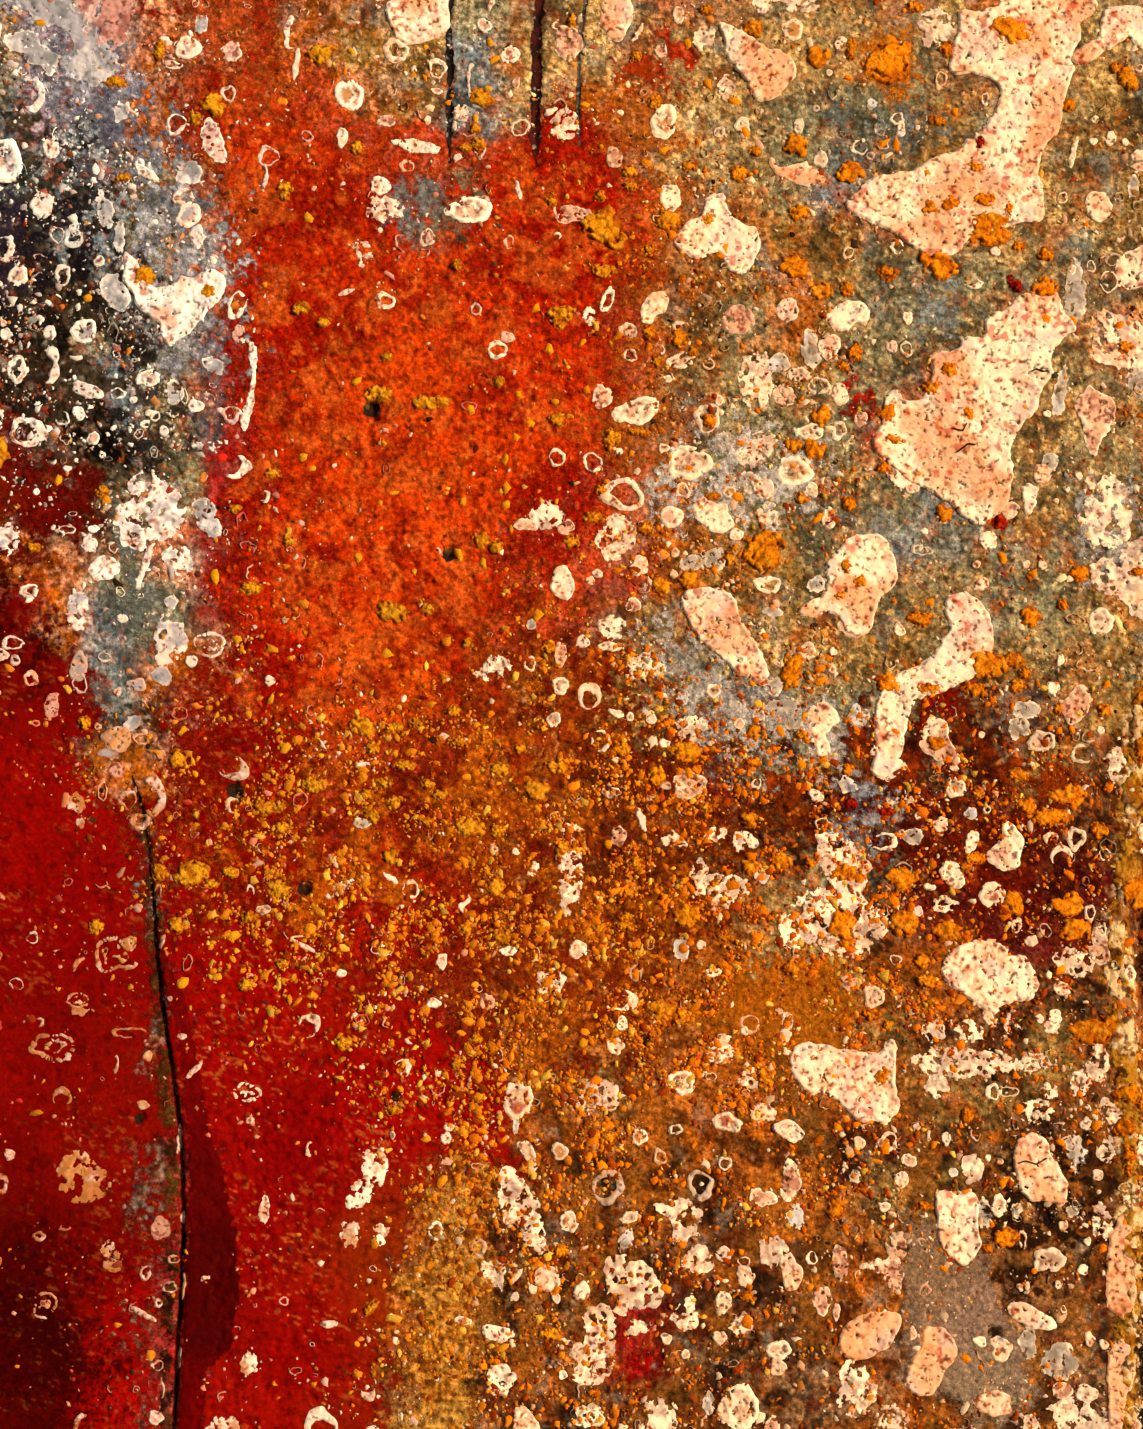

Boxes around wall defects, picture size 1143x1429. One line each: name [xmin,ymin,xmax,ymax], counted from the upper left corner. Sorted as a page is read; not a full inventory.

crack [445,0,455,163]
crack [528,0,546,167]
crack [576,0,588,146]
peeling [845,0,1143,256]
peeling [618,291,669,338]
peeling [658,245,1143,917]
peeling [608,693,710,747]
spalling [611,825,627,846]
crack [132,775,186,1421]